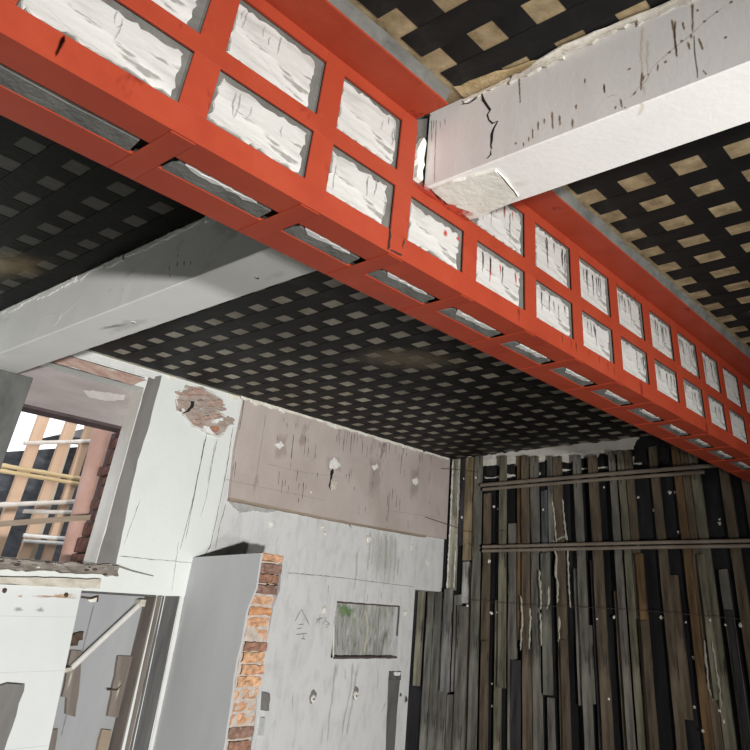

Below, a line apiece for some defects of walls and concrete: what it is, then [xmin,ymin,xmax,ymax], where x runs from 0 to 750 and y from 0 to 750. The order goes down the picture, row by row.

peeling [453,0,695,103]
rust [657,4,703,70]
crack [464,94,518,197]
spalling [175,385,449,460]
crack [121,403,334,586]
damp [520,499,571,650]